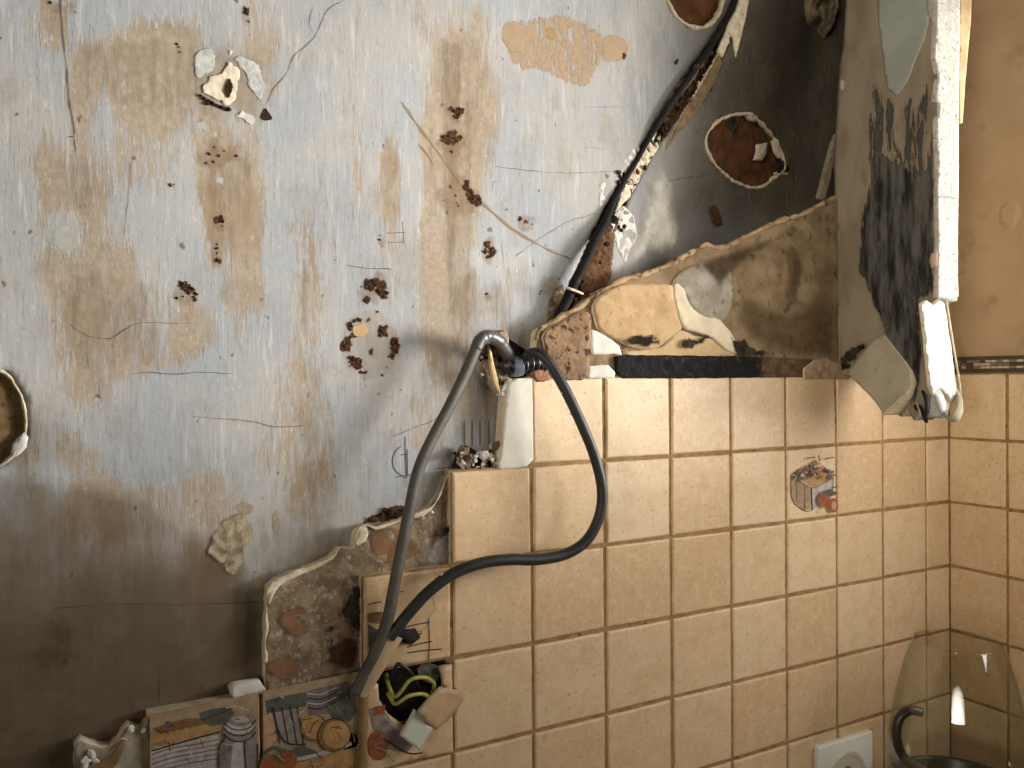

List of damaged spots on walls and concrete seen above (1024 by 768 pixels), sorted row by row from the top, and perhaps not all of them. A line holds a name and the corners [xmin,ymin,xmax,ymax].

spalling [195,48,272,125]
crack [267,1,342,102]
peeling [502,15,628,86]
spalling [666,0,725,30]
spalling [705,112,790,189]
spalling [534,194,838,340]
leakage [859,83,934,402]
peeling [929,252,938,269]
spalling [0,369,28,466]
peeling [208,503,253,575]
peeling [252,475,449,690]